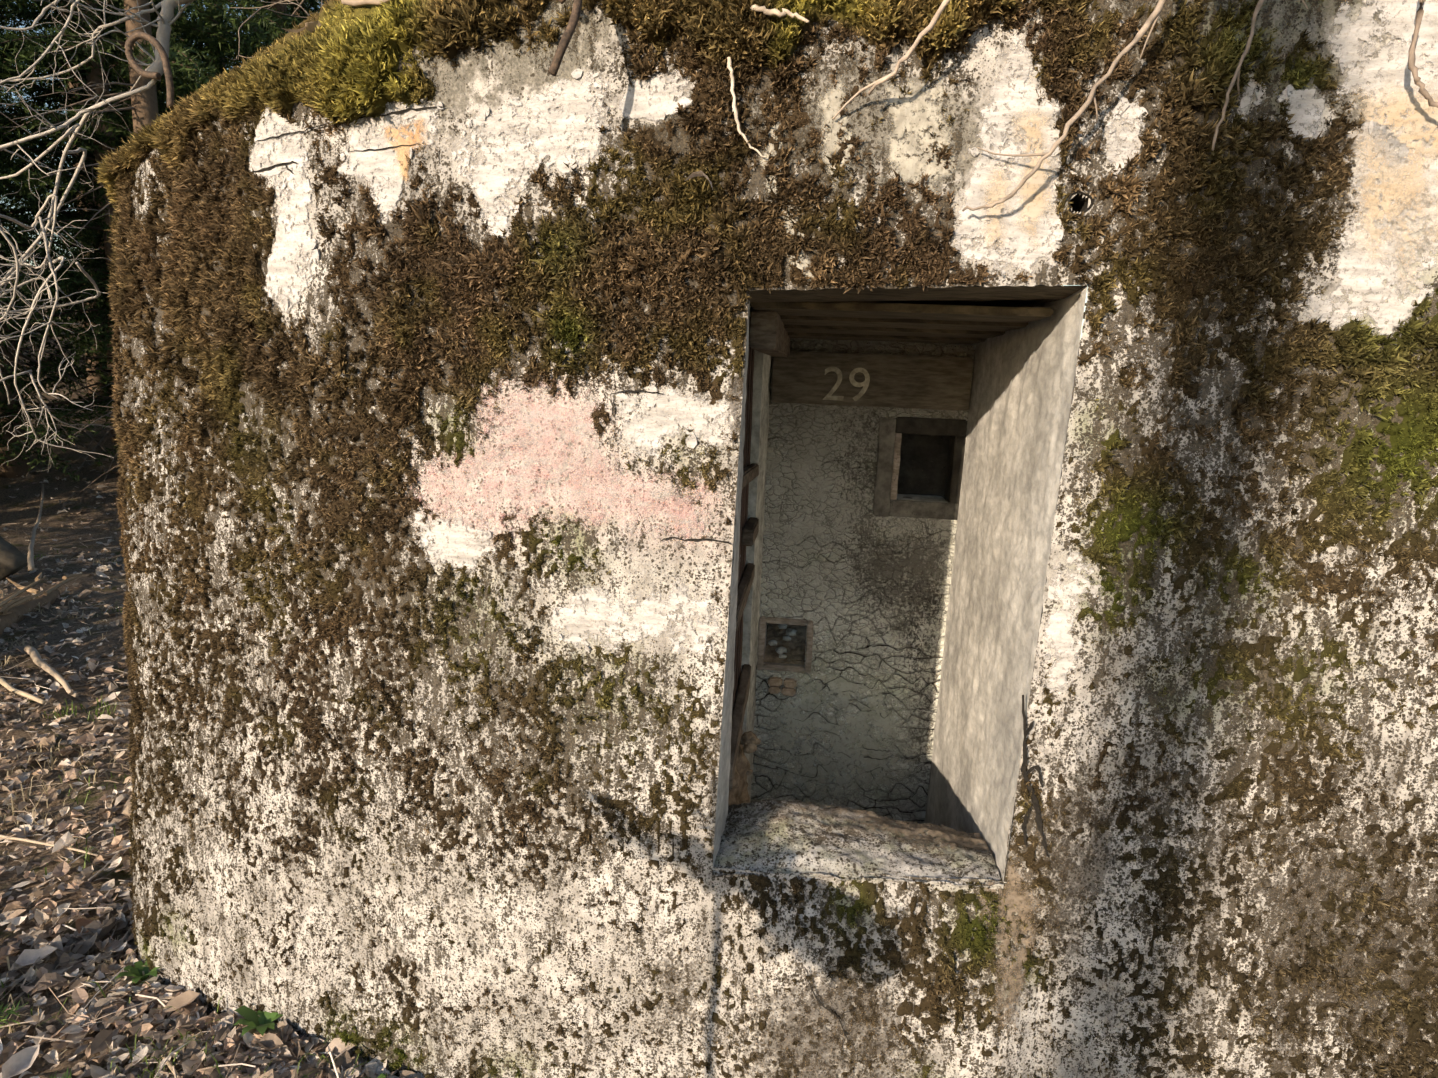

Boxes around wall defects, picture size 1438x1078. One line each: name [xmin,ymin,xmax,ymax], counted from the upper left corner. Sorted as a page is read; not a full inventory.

crack [751,638,942,823]
crack [1020,695,1050,857]